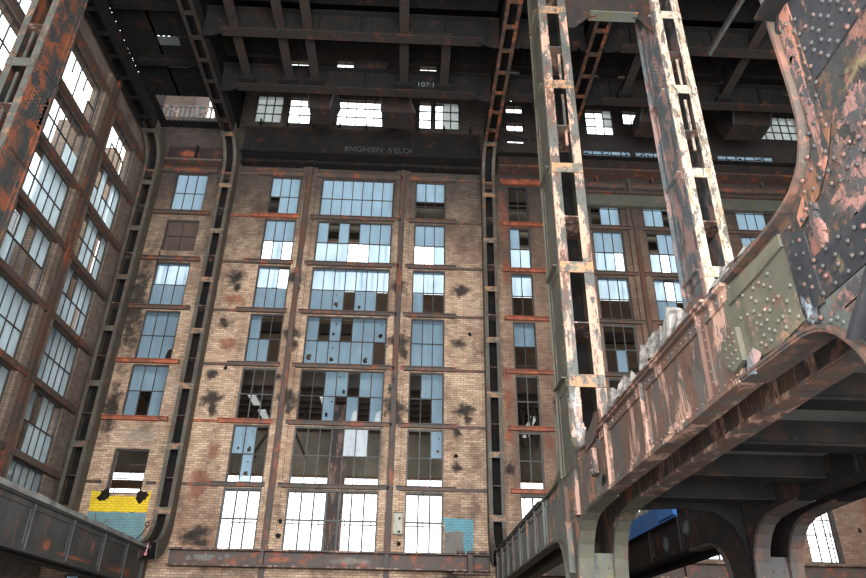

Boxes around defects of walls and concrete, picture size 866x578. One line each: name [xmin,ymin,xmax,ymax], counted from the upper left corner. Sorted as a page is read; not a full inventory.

water stain [205,400,220,419]